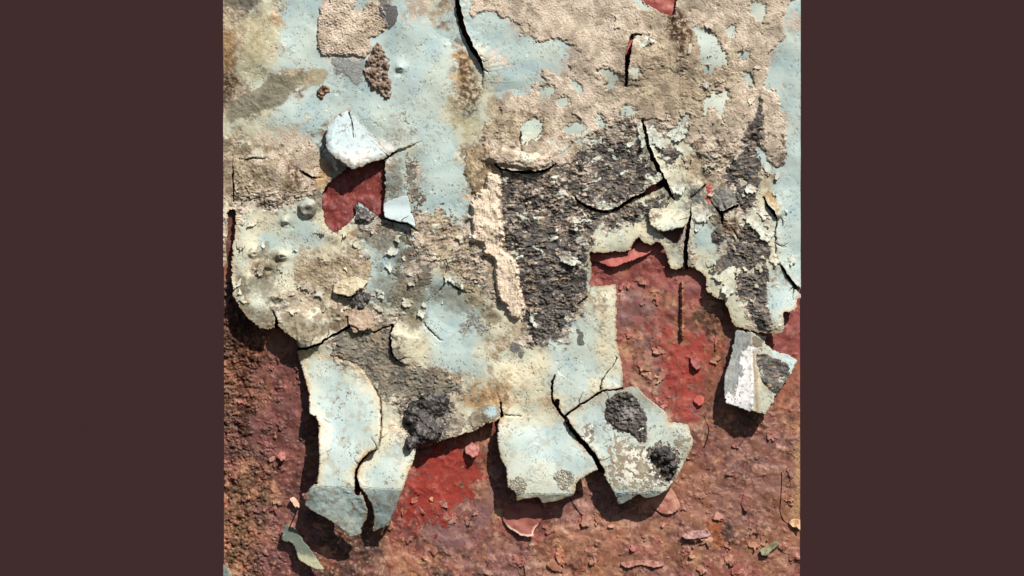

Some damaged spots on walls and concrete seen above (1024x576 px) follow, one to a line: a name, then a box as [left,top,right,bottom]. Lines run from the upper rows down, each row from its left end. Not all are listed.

crack [455,0,489,74]
crack [625,33,642,86]
spalling [231,110,389,209]
crack [575,119,738,271]
rust [226,469,269,562]
rust [230,313,267,436]
peeling [281,525,324,570]
peeling [240,350,479,537]
crack [550,357,623,472]
peeling [497,386,695,541]
peeling [690,330,797,415]
rust [792,447,800,519]